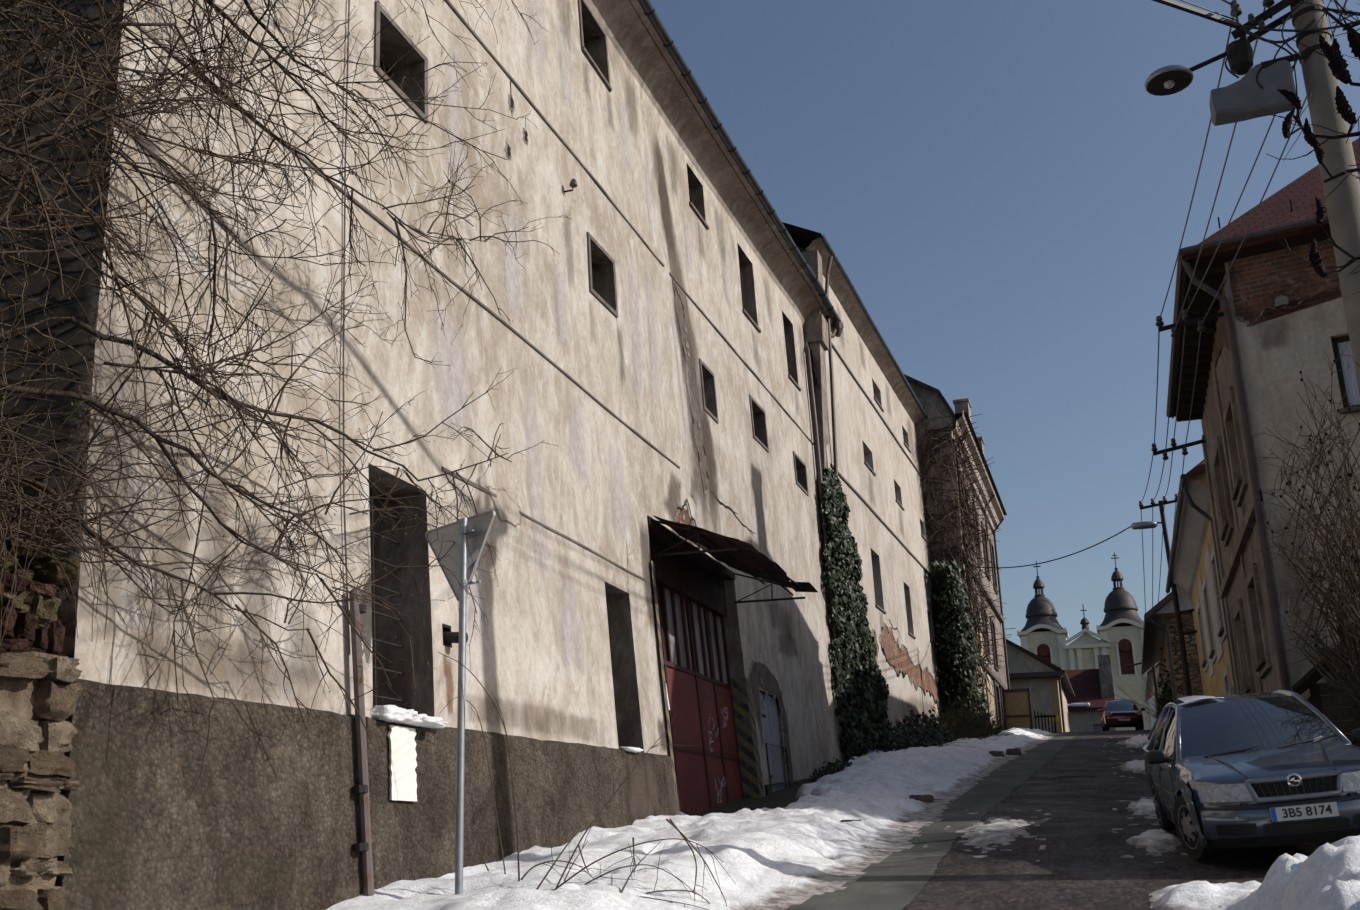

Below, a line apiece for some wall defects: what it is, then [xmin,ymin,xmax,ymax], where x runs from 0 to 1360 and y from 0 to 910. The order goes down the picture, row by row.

damp [656,148,717,522]
flaking render [1212,239,1342,368]
flaking render [871,622,939,707]